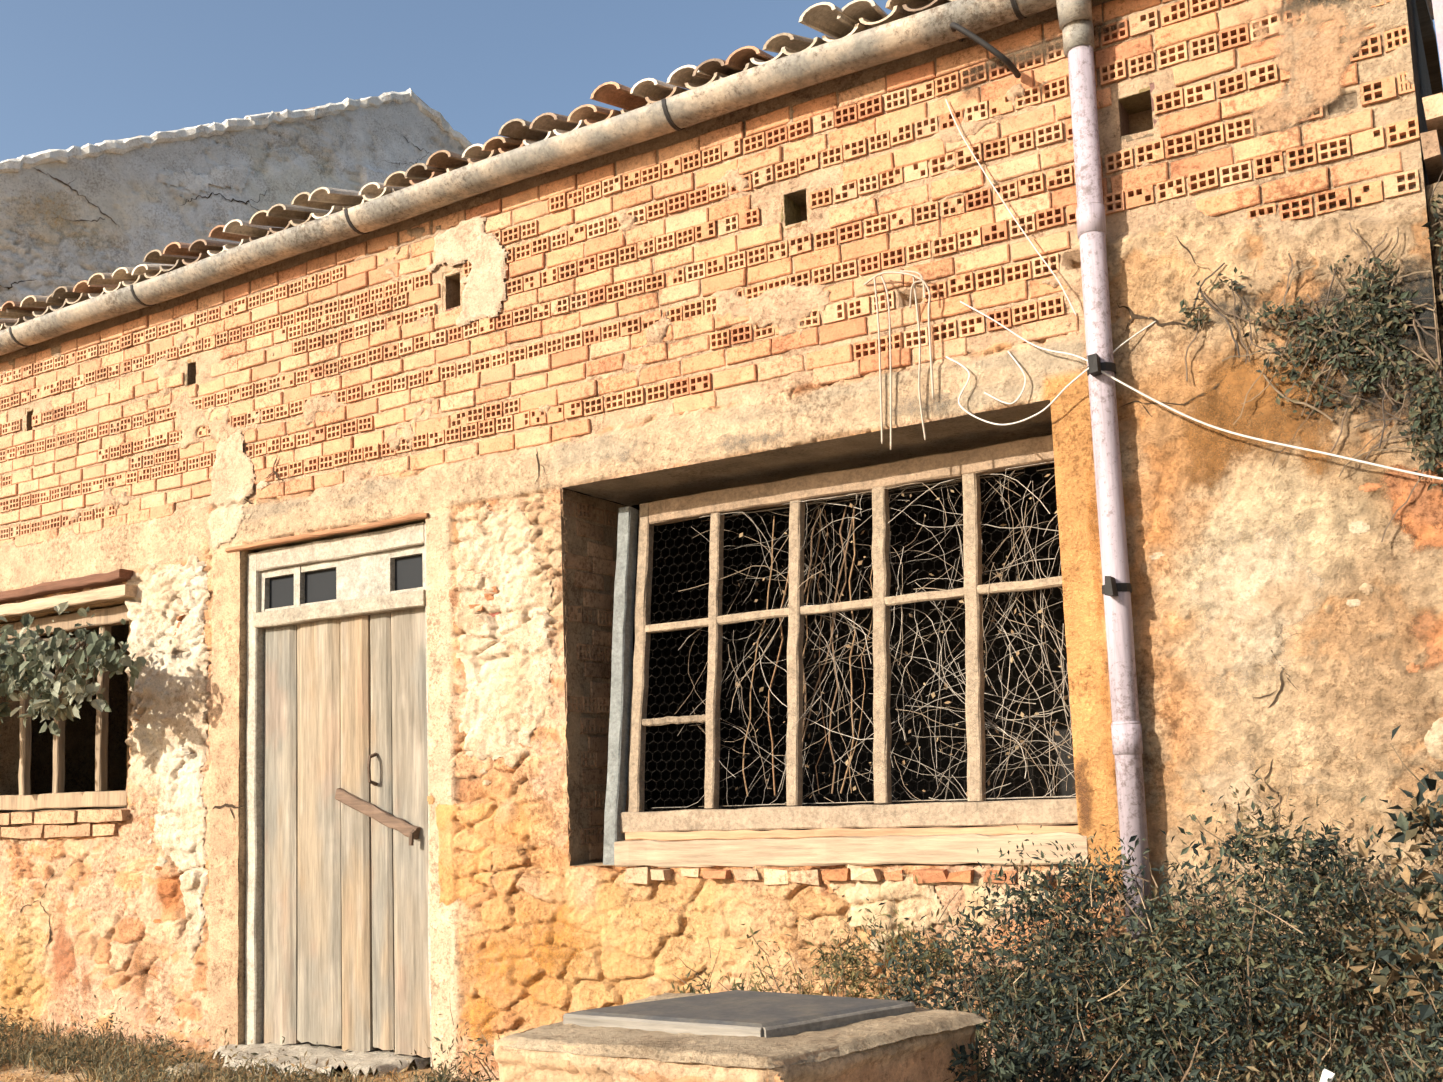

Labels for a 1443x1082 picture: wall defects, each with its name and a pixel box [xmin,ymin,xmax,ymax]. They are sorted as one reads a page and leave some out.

crack [32,167,117,225]
crack [177,190,267,210]
flaking render [426,215,509,327]
crack [1117,303,1202,331]
spalling [1359,463,1443,550]
spalling [1406,613,1443,673]